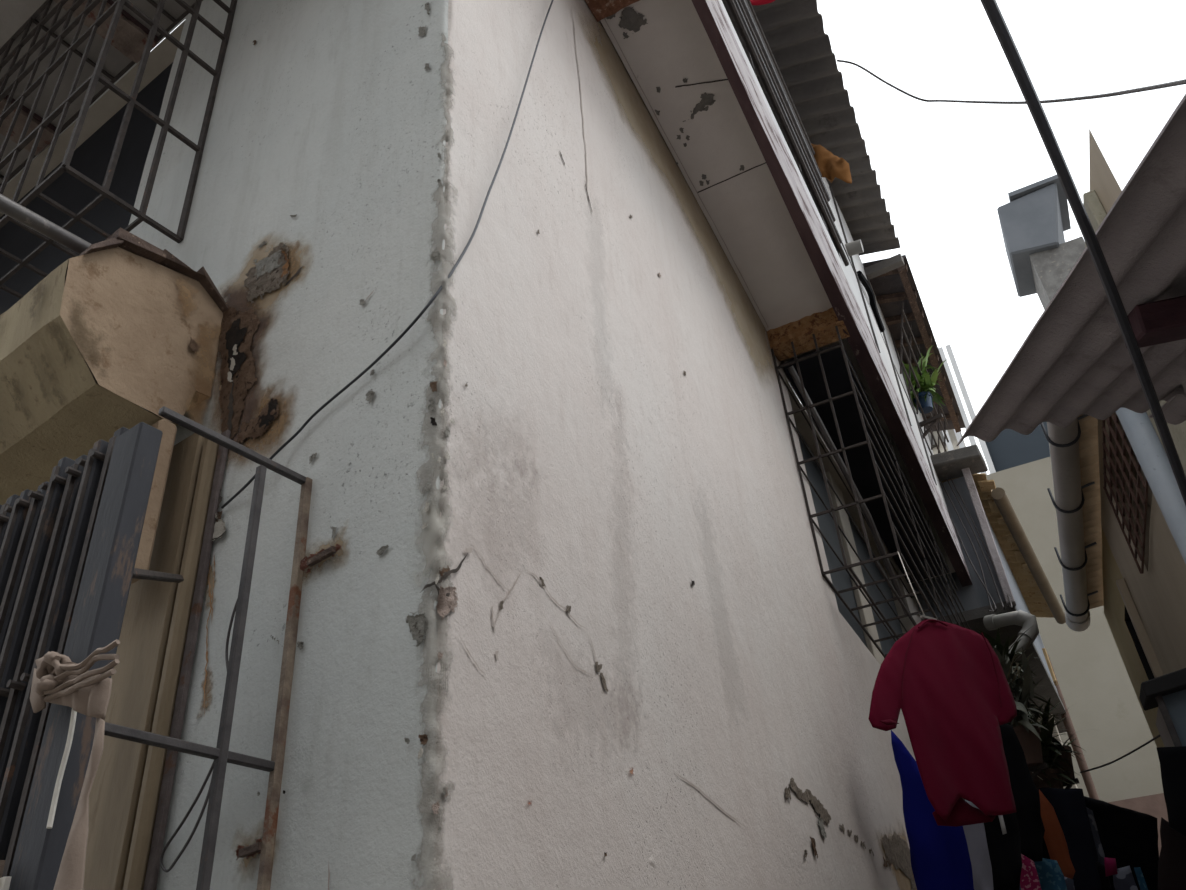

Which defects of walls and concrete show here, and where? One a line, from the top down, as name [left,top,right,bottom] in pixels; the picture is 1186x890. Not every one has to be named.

peeling [418,2,431,37]
peeling [677,92,716,147]
spalling [213,240,306,462]
peeling [404,35,473,890]
crack [459,539,608,692]
peeling [785,778,917,890]